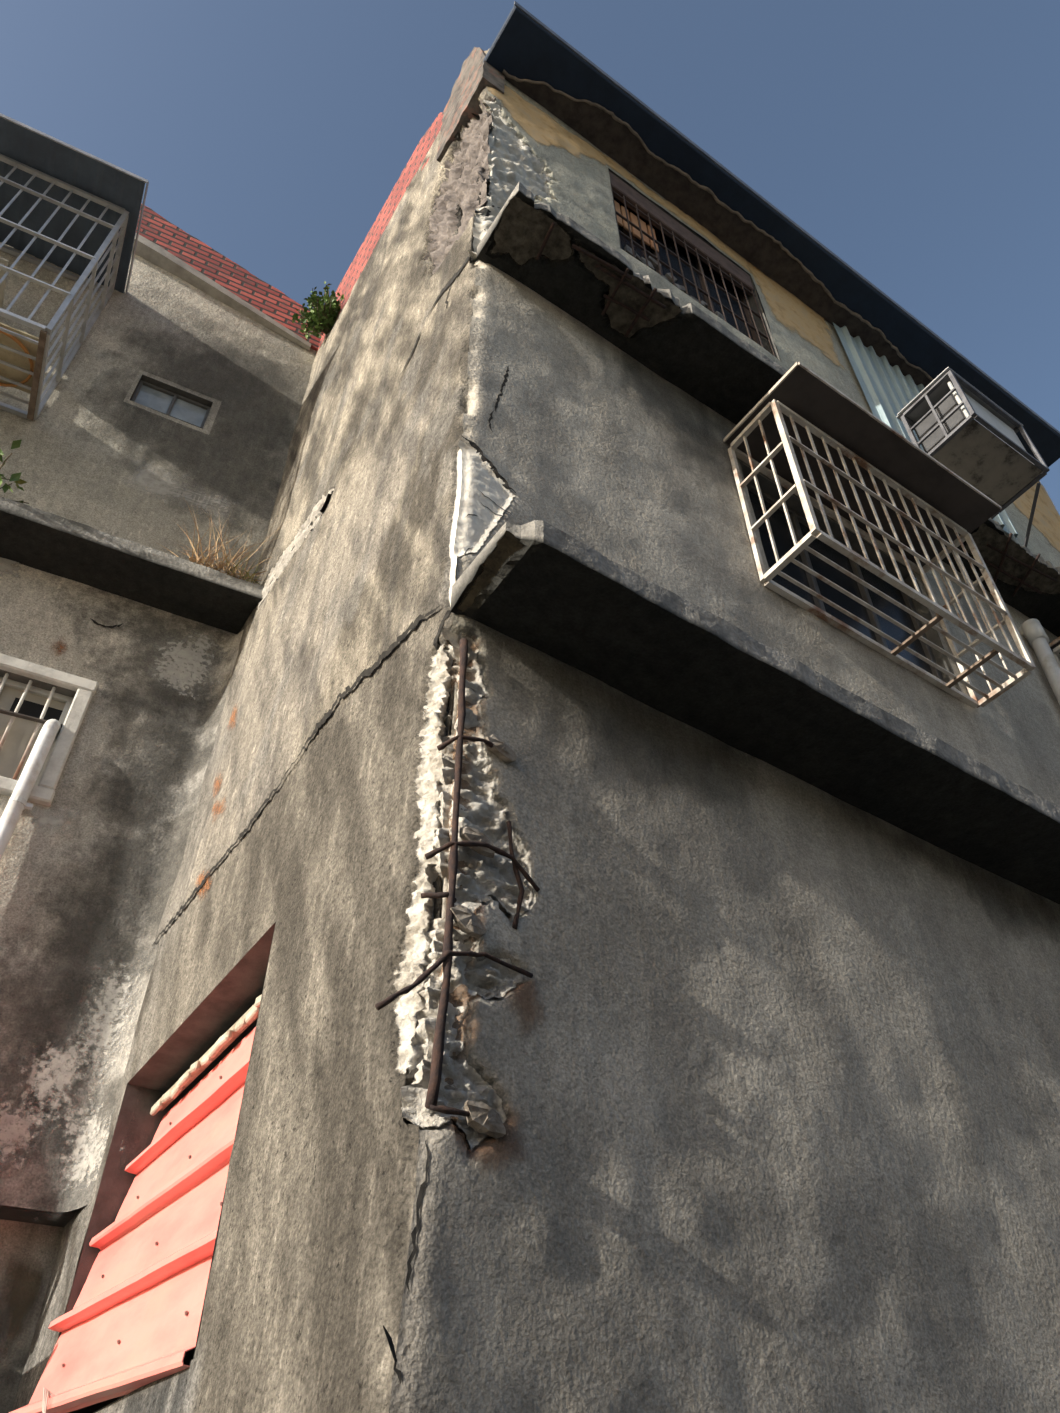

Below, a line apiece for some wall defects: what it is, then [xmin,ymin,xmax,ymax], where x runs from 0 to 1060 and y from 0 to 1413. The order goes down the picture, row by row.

spalling [424,97,551,275]
peeling [503,70,934,381]
peeling [461,435,516,493]
water stain [0,591,226,1186]
crack [152,605,450,946]
spalling [375,627,540,1157]